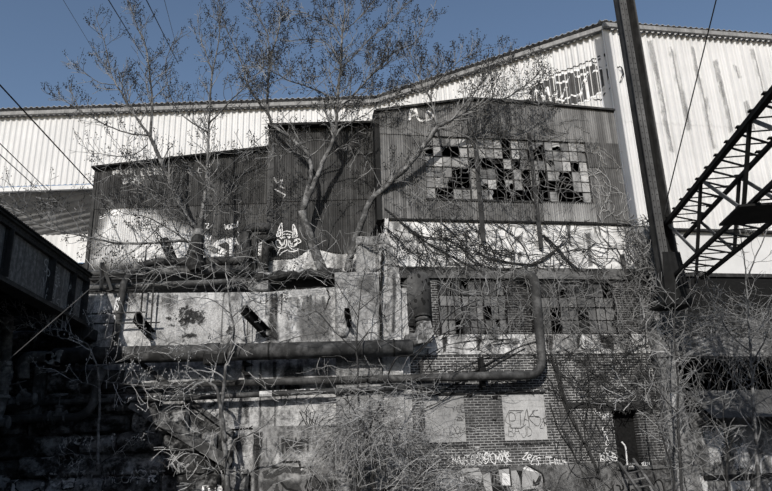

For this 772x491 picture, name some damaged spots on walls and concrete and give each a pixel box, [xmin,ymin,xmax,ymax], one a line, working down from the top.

water stain [124,293,256,339]